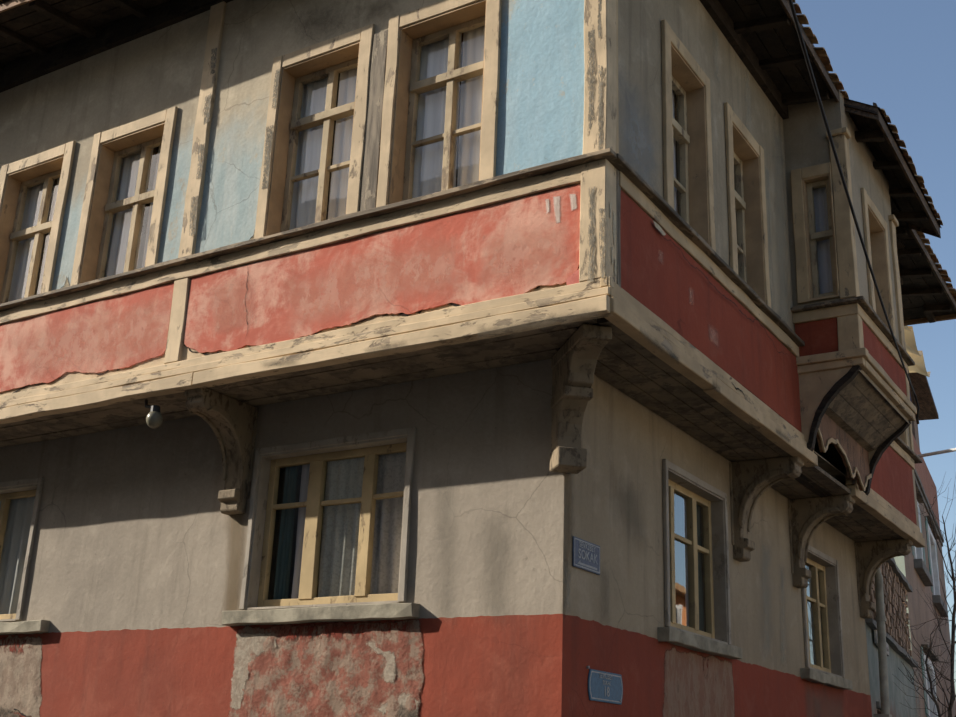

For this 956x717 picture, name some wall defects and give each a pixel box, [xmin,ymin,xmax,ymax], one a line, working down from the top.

peeling [587,0,604,150]
peeling [566,187,616,285]
crack [183,266,249,355]
crack [303,310,422,337]
spalling [0,635,42,717]
spalling [228,619,425,717]
spalling [663,648,735,717]